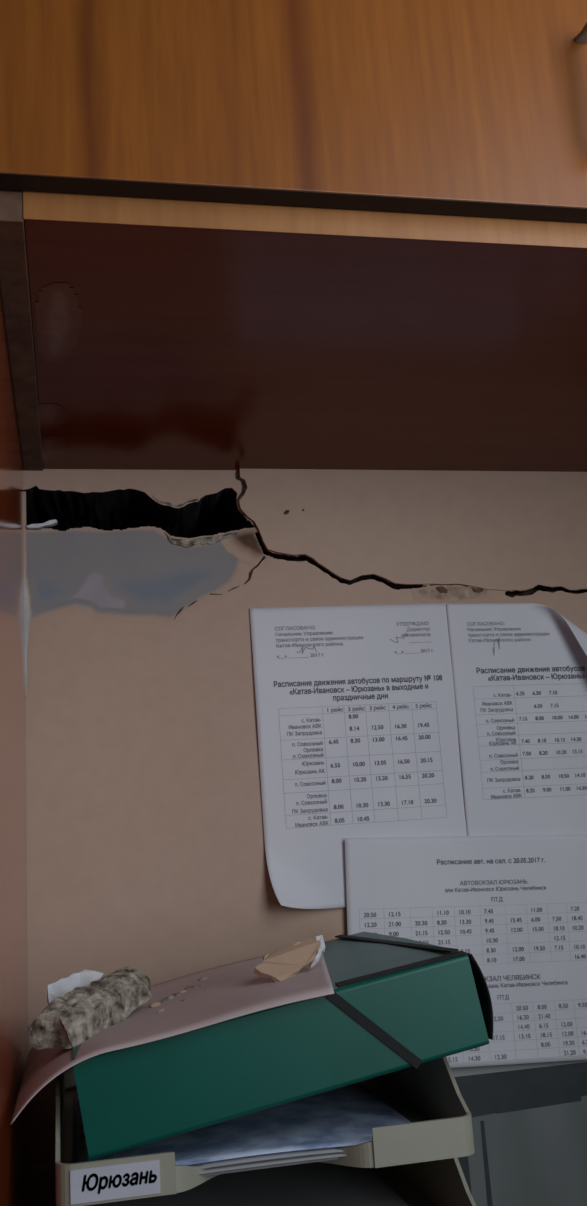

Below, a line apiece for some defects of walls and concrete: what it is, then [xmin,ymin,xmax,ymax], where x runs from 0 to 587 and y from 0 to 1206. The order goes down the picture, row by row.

peeling [23,486,276,626]
crack [174,470,587,620]